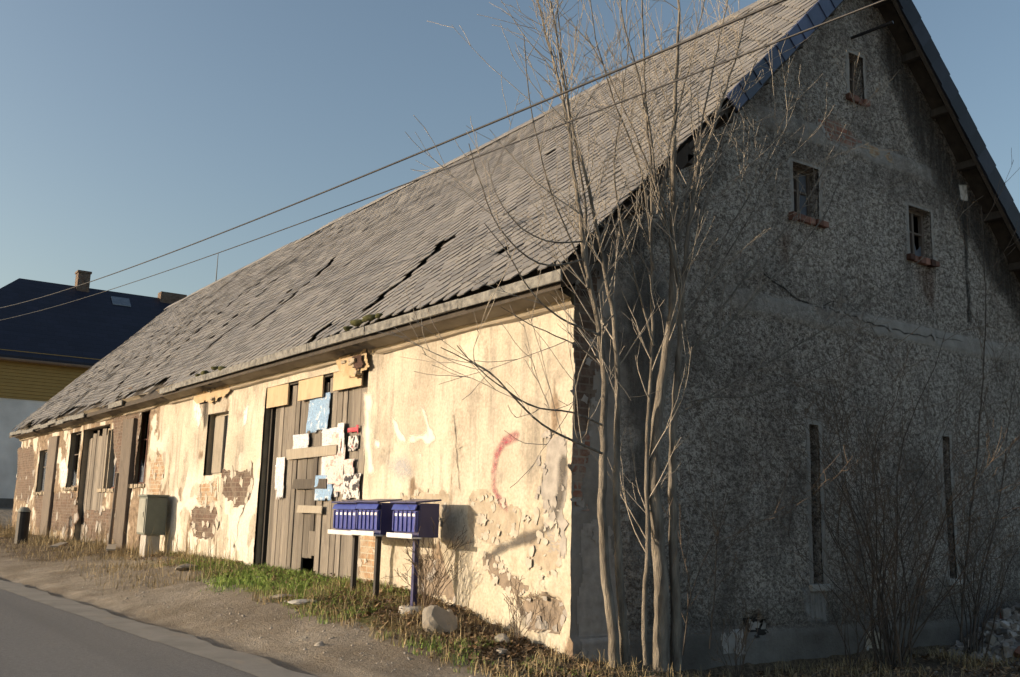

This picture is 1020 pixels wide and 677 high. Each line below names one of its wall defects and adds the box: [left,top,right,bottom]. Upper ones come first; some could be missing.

crack [763,273,960,341]
flaking render [16,445,116,543]
flaking render [190,460,254,540]
flaking render [400,487,452,527]
spalling [418,554,456,604]